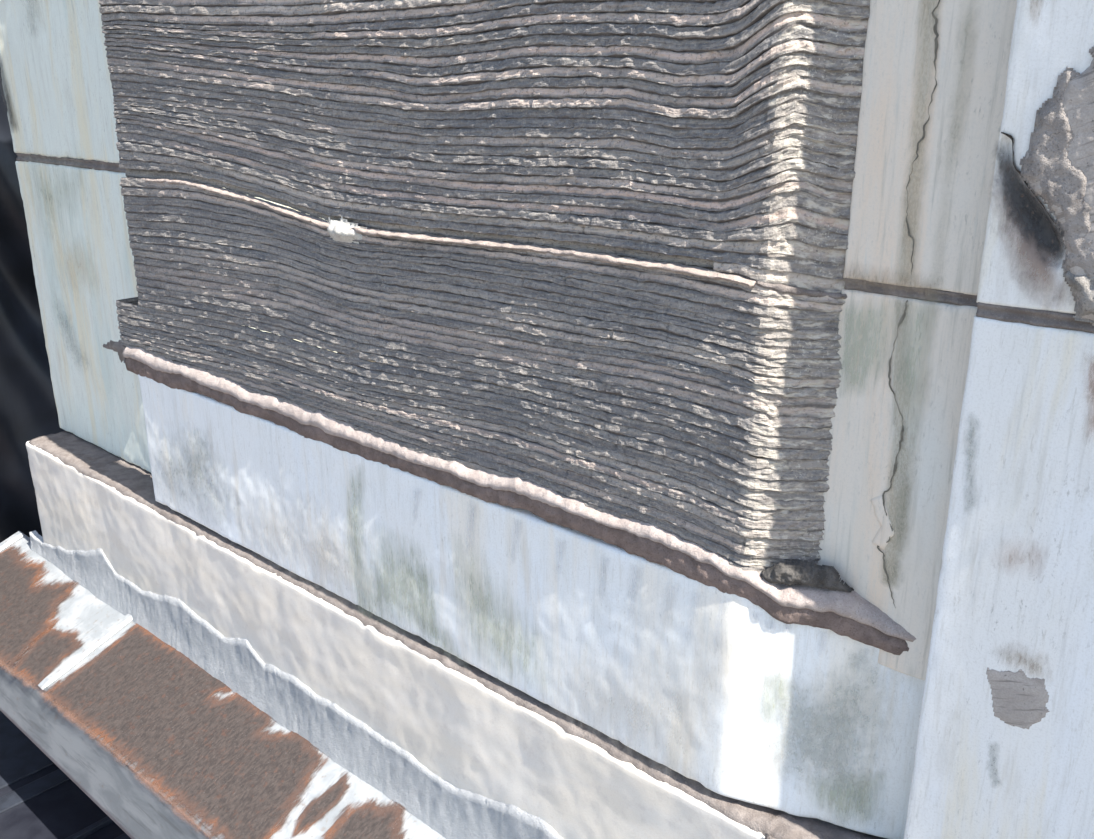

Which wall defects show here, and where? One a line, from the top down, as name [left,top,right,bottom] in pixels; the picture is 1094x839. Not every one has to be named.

crack [870,0,940,606]
rust [0,546,405,839]